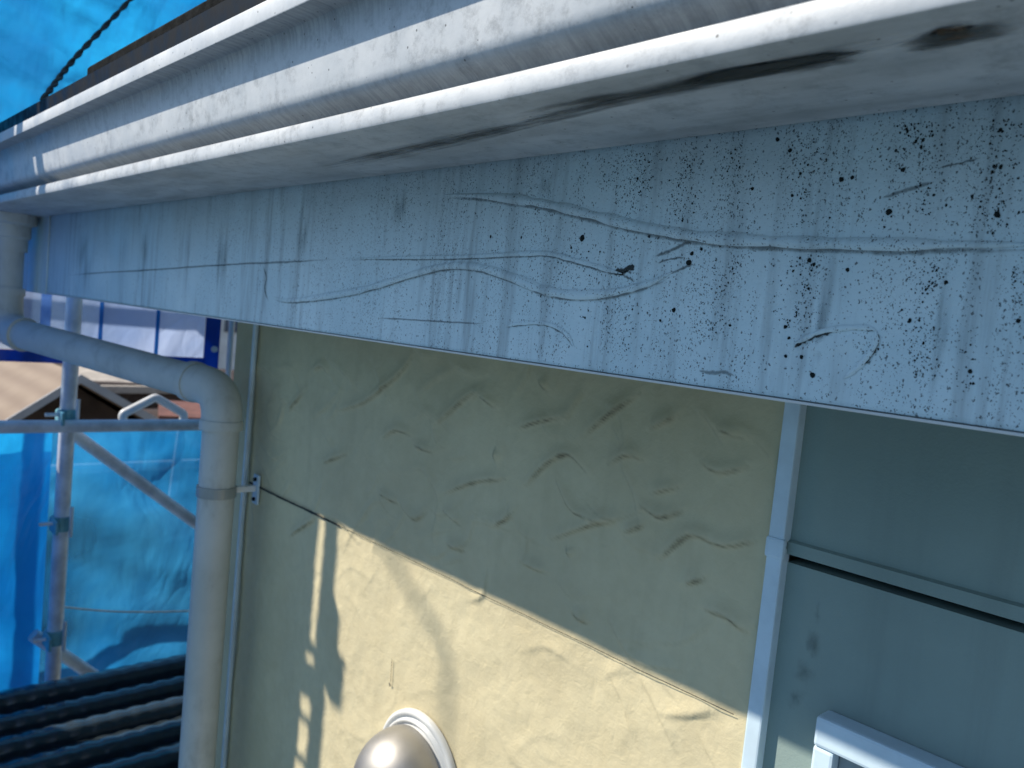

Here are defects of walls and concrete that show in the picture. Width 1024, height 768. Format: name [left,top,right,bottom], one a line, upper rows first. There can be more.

water stain [776,133,854,228]
water stain [877,121,949,217]
water stain [963,119,1024,242]
crack [264,193,1024,347]
water stain [686,246,752,337]
water stain [773,255,822,359]
water stain [877,257,950,377]
crack [249,481,734,715]